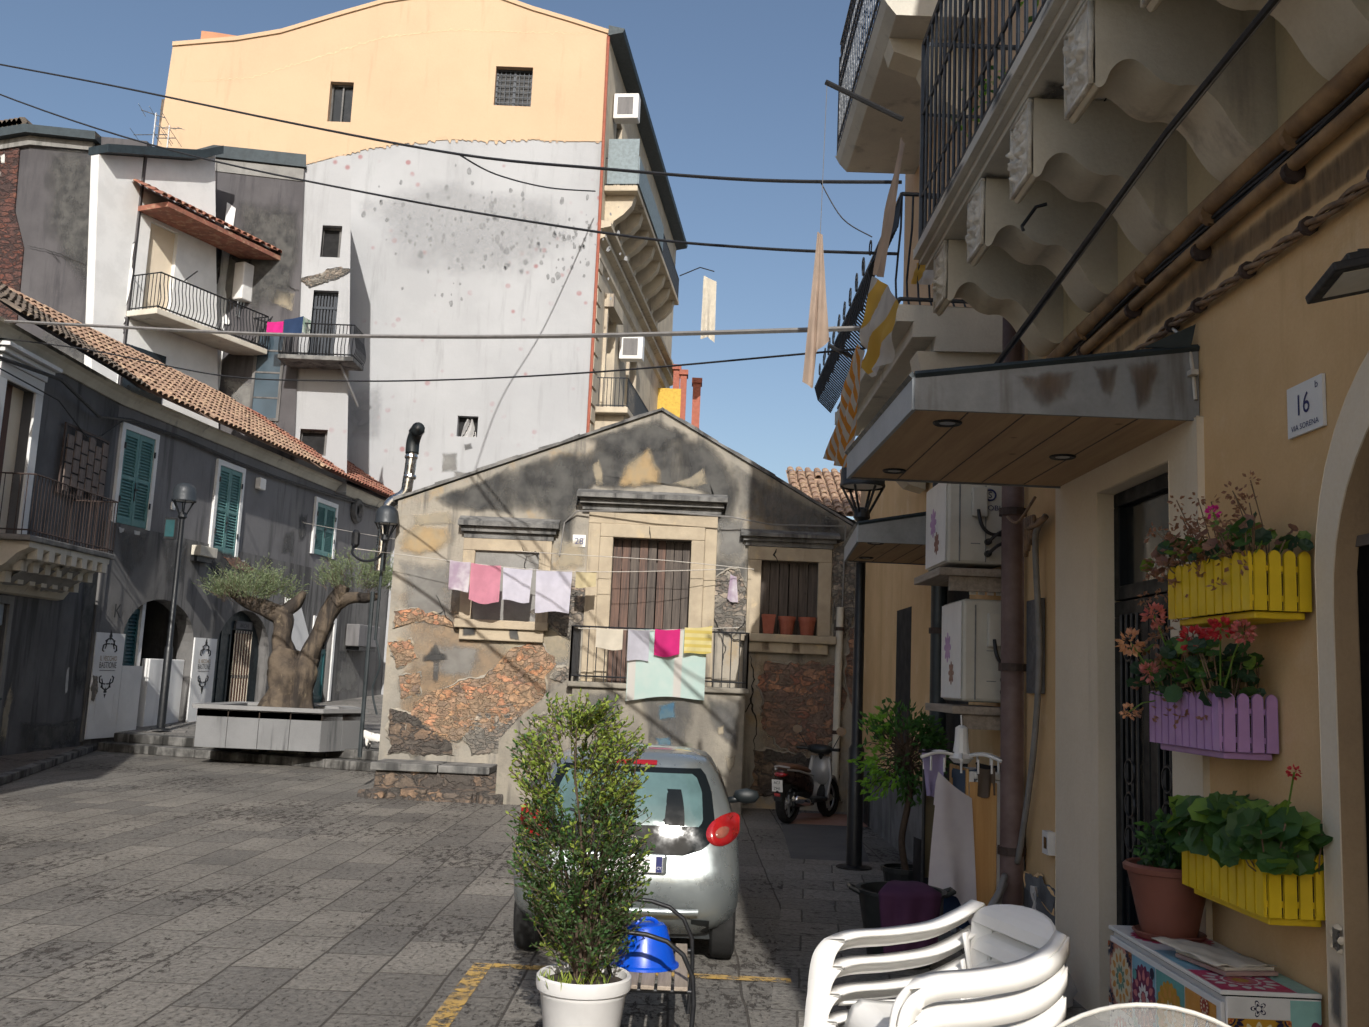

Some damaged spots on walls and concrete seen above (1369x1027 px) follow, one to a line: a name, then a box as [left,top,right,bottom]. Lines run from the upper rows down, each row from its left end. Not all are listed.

damp [441,421,849,576]
spalling [385,579,585,758]
spalling [748,541,856,802]